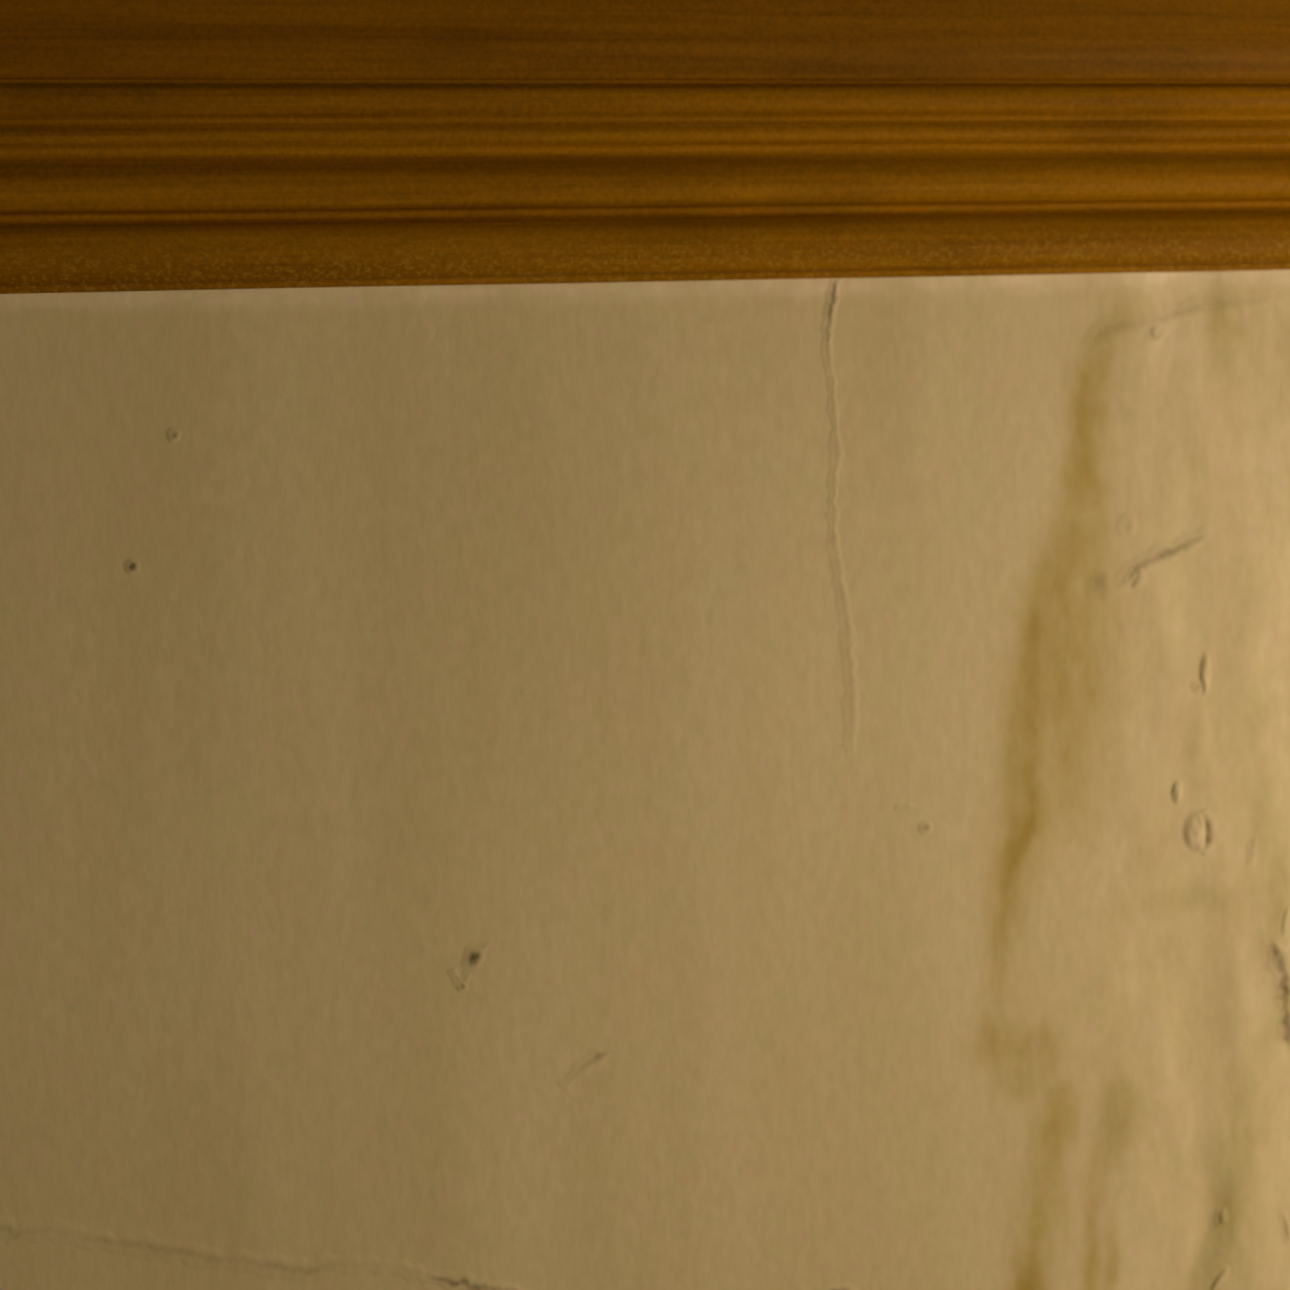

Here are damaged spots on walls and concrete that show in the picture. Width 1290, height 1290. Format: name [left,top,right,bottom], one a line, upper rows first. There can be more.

crack [1084,525,1210,604]
water stain [946,290,1161,1290]
crack [1258,905,1290,1052]